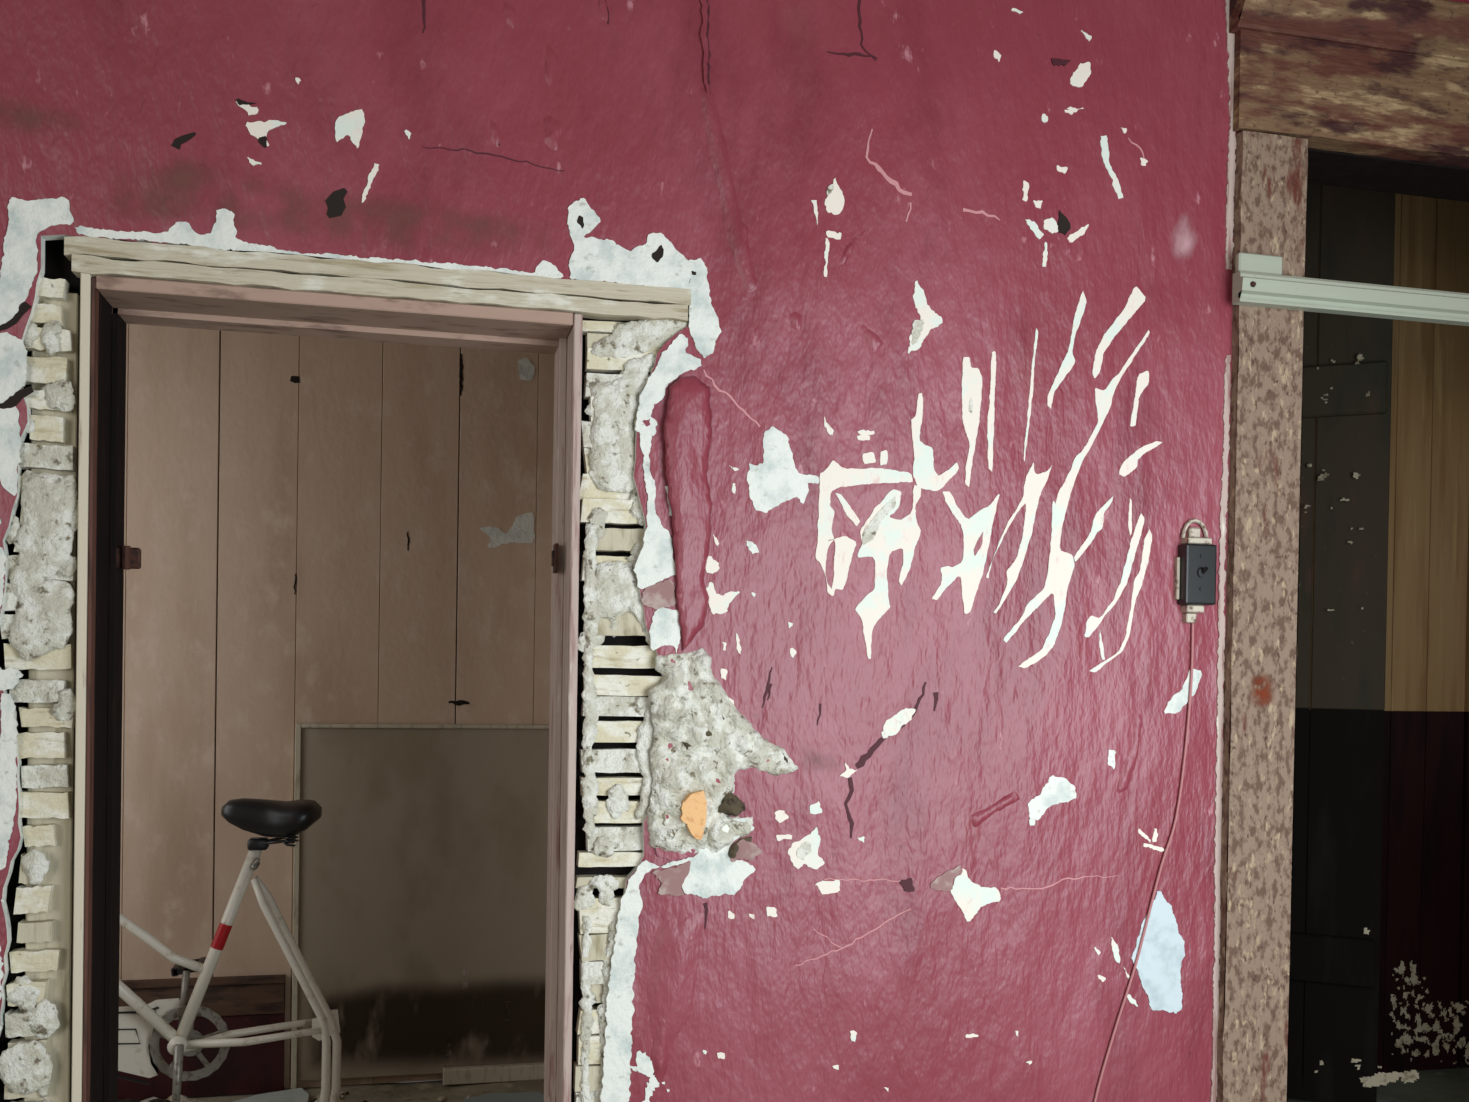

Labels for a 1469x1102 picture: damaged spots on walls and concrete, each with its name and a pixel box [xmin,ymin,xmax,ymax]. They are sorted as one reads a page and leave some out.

crack [0,301,32,331]
peeling [908,281,943,354]
crack [0,386,34,409]
flaking render [730,426,819,513]
spalling [0,197,798,1102]
crack [762,667,773,708]
crack [844,682,938,838]
peeling [775,801,840,894]
peeling [1138,828,1164,852]
crack [795,878,911,966]
flaking render [1094,891,1185,1014]
peeling [1351,961,1469,1088]